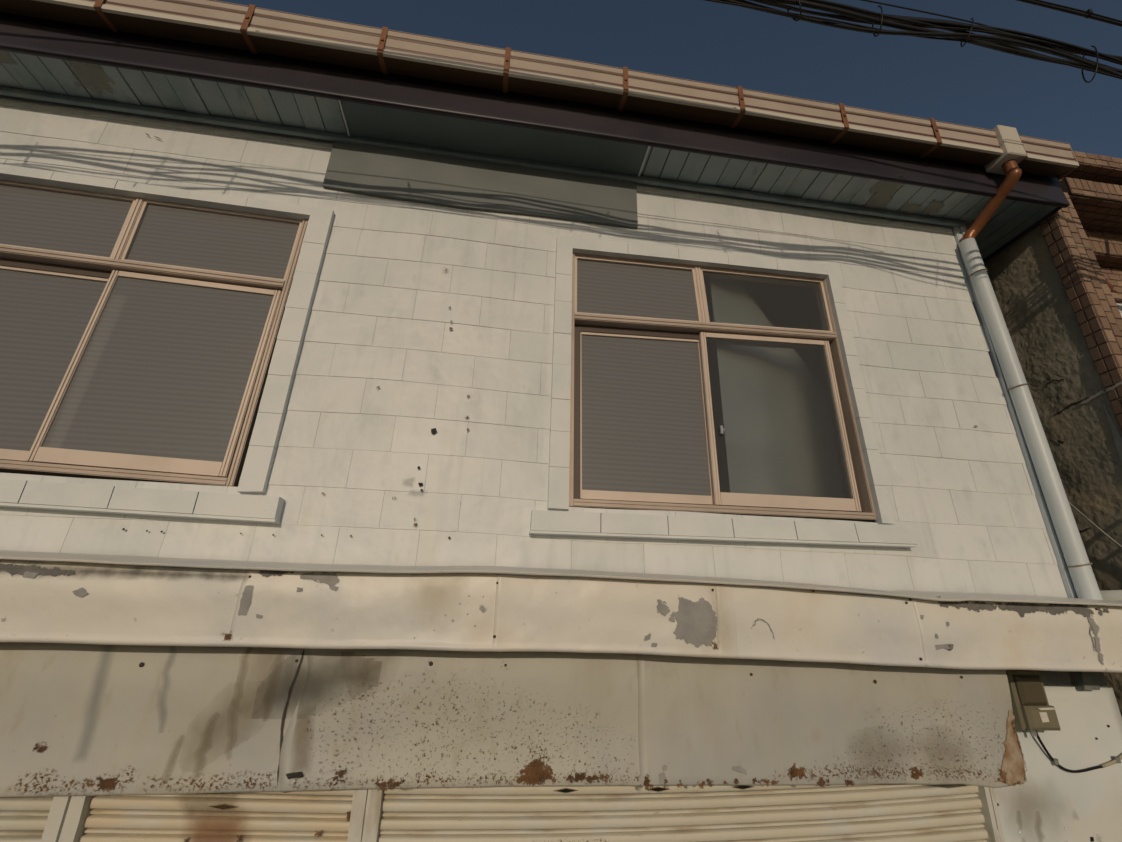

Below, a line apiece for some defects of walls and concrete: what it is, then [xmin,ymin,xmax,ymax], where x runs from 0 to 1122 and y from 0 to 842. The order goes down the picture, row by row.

peeling [657,596,718,648]
peeling [938,596,1110,664]
rust [286,679,682,791]
rust [14,769,136,795]
rust [150,773,274,793]
rust [753,763,995,787]